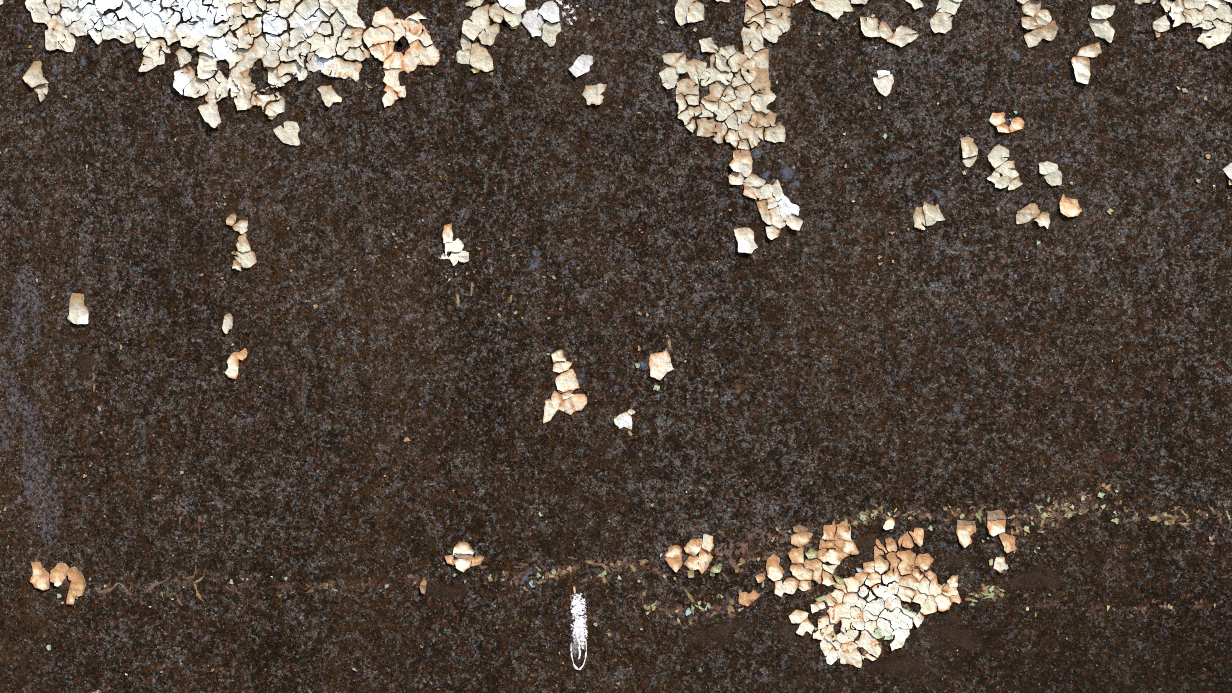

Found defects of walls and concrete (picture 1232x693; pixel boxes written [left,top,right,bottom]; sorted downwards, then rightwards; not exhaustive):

peeling [456,0,562,78]
peeling [1071,4,1115,84]
peeling [656,0,962,253]
peeling [960,111,1024,191]
peeling [543,350,587,423]
corrosion [845,501,987,553]
corrosion [1008,484,1231,536]
corrosion [95,566,206,609]
corrosion [478,556,666,591]
corrosion [628,529,797,625]
peeling [739,505,961,668]
corrosion [965,582,1004,606]